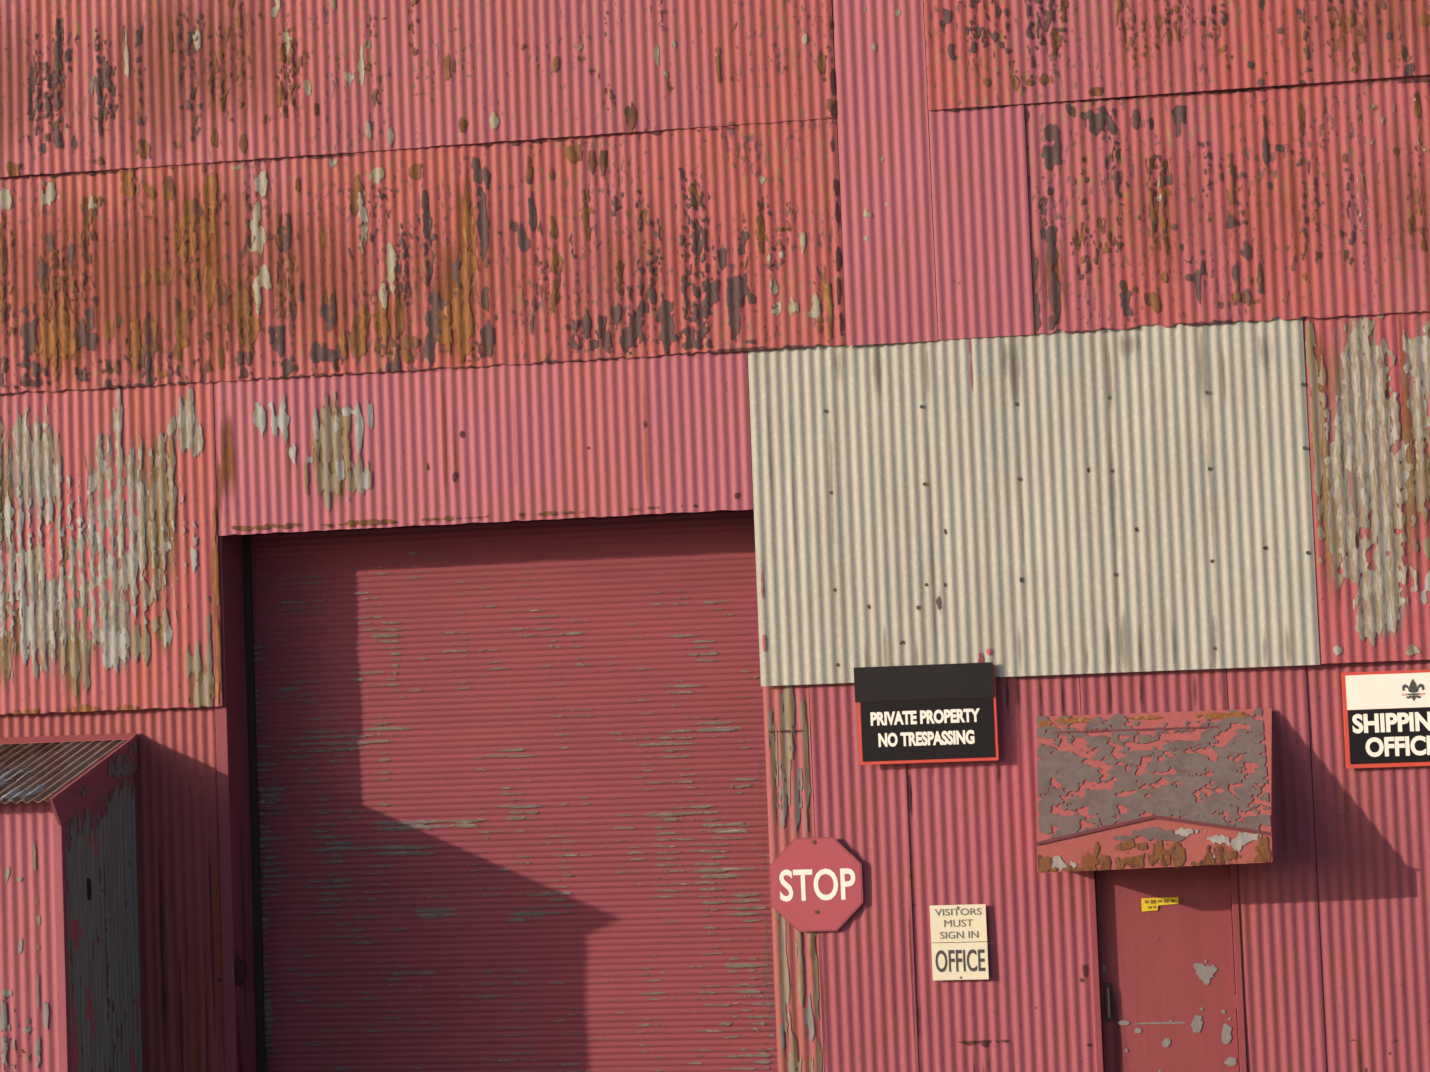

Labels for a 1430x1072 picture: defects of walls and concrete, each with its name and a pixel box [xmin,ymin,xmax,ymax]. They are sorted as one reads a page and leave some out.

rust [943,105,1029,123]
rust [1191,86,1290,95]
rust [41,307,80,371]
rust [252,372,353,380]
peeling [0,0,836,707]
rust [421,179,474,486]
rust [706,344,820,353]
peeling [1305,314,1430,655]
peeling [1036,708,1271,872]
peeling [66,741,142,1072]
peeling [0,974,49,1072]
peeling [1118,1007,1203,1047]